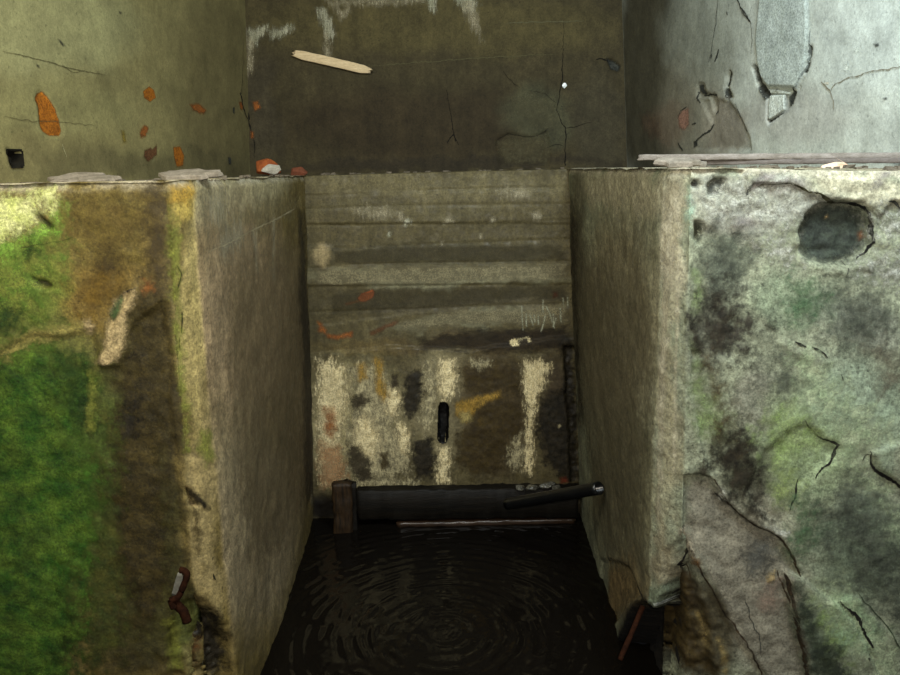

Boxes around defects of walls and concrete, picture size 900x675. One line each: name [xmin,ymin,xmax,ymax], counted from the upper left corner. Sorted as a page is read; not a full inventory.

spalling [696,70,747,131]
flaking render [755,0,813,122]
crack [821,66,900,110]
water stain [140,182,170,295]
water stain [657,172,812,410]
water stain [107,296,174,638]
water stain [298,217,583,498]
spalling [0,143,900,675]
water stain [699,386,772,522]
crack [790,420,840,510]
crack [862,451,900,488]
crack [840,593,900,661]